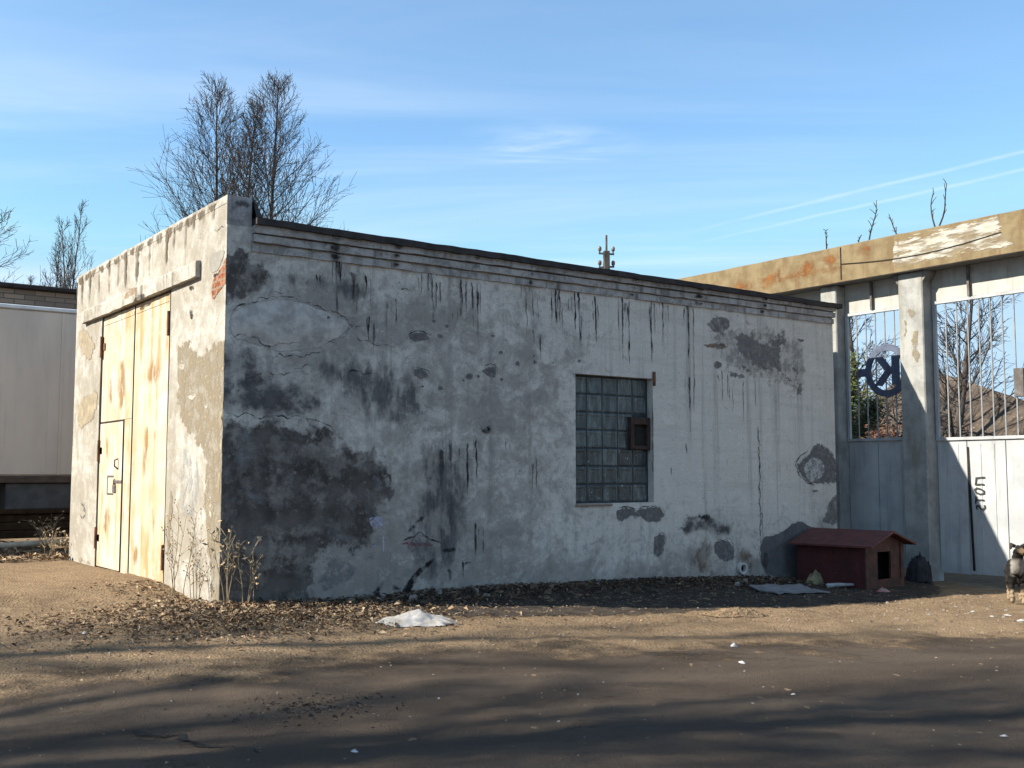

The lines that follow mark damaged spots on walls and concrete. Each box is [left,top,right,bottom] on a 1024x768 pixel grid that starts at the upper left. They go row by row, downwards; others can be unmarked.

peeling [893,217,1012,265]
spalling [209,250,226,299]
crack [234,291,403,378]
spalling [704,316,804,394]
rust [110,363,124,406]
crack [237,412,334,436]
flaking render [177,340,224,601]
leakage [219,352,394,603]
spalling [795,443,837,525]
spalling [617,506,666,557]
spalling [714,539,735,562]